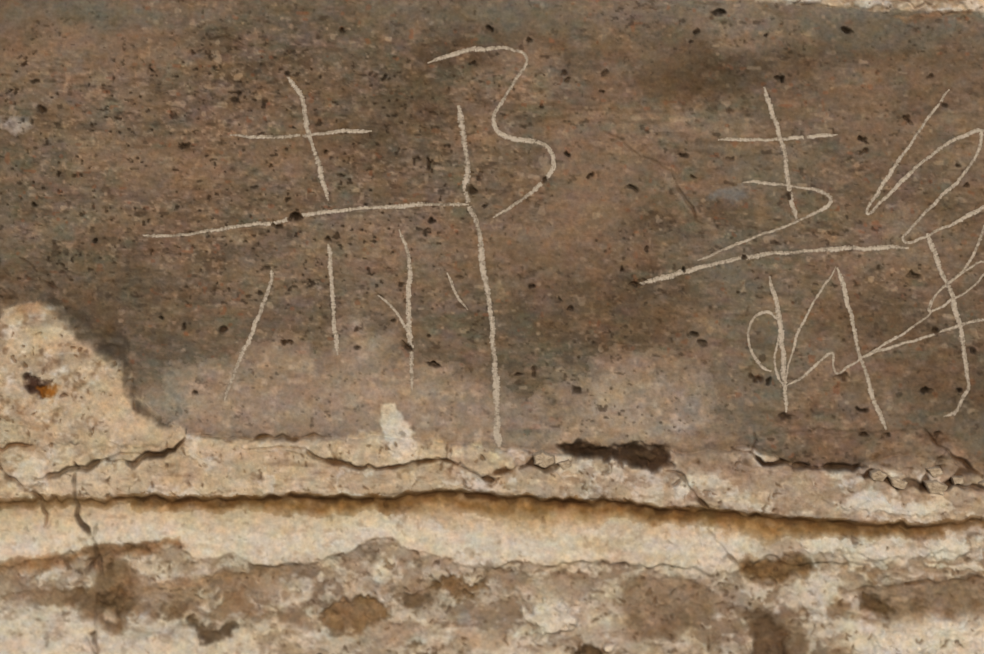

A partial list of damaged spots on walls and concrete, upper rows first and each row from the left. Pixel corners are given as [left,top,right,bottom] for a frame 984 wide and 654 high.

spalling [0,262,180,431]
spalling [533,414,760,490]
crack [0,426,984,578]
crack [839,575,984,596]
crack [85,610,102,654]